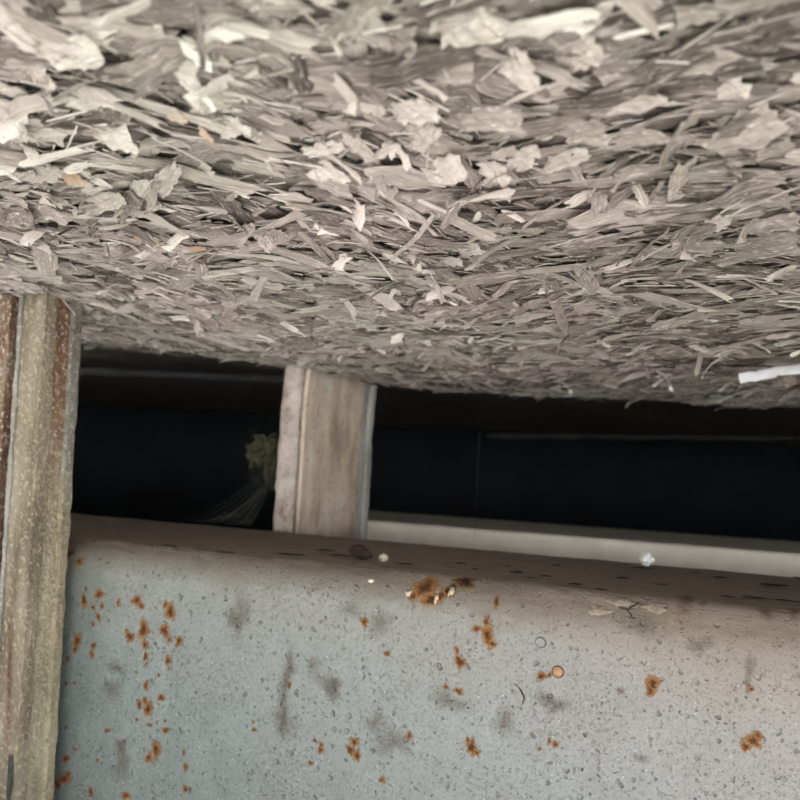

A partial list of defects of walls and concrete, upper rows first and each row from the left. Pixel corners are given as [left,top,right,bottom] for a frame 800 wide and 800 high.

corrosion [409,562,476,606]
corrosion [80,586,105,627]
corrosion [66,633,96,662]
corrosion [125,595,183,666]
corrosion [454,646,467,669]
corrosion [471,617,497,650]
corrosion [645,675,661,697]
corrosion [135,680,165,727]
corrosion [144,739,161,763]
corrosion [346,737,361,763]
corrosion [465,736,480,758]
corrosion [741,730,763,753]